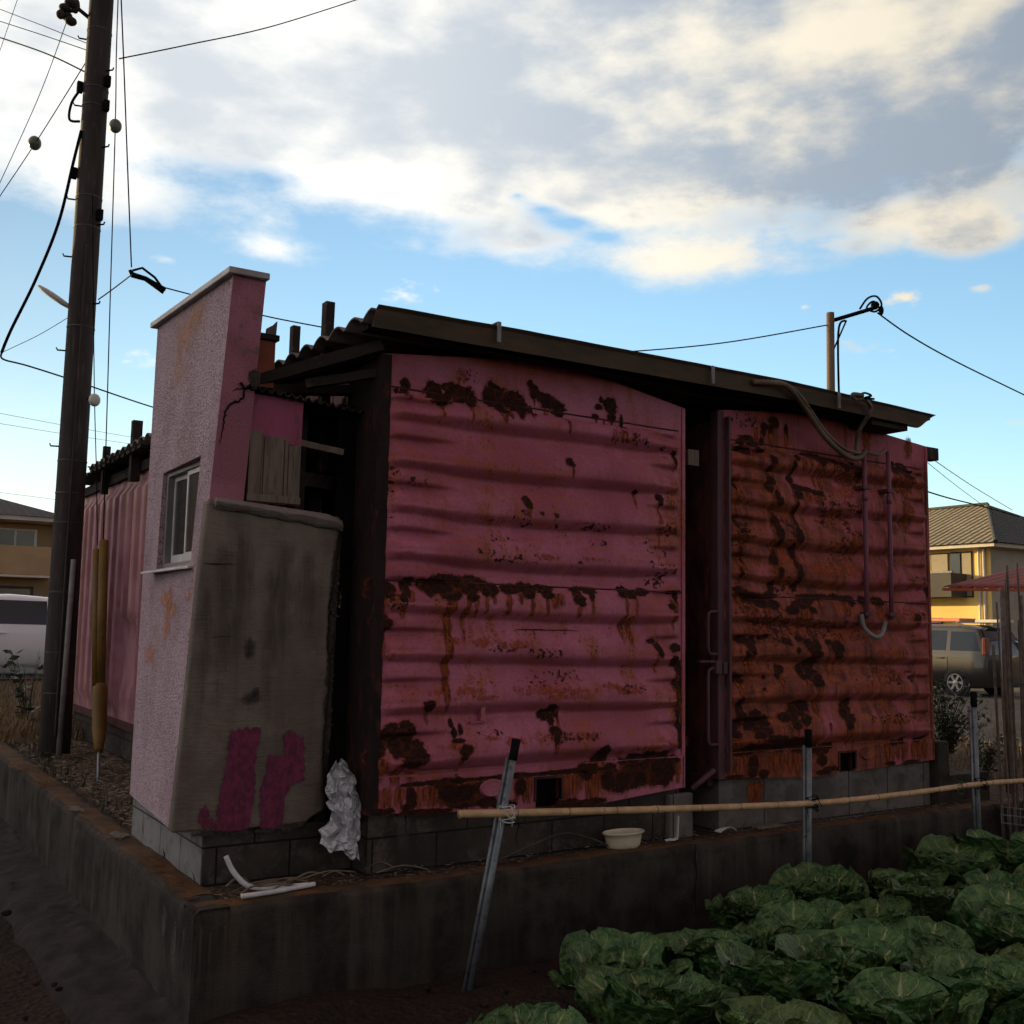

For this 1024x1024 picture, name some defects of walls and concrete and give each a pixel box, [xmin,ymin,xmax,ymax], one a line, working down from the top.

crack [219,386,254,442]
corrosion [394,368,572,433]
corrosion [592,396,647,444]
corrosion [725,410,927,803]
corrosion [364,573,687,816]